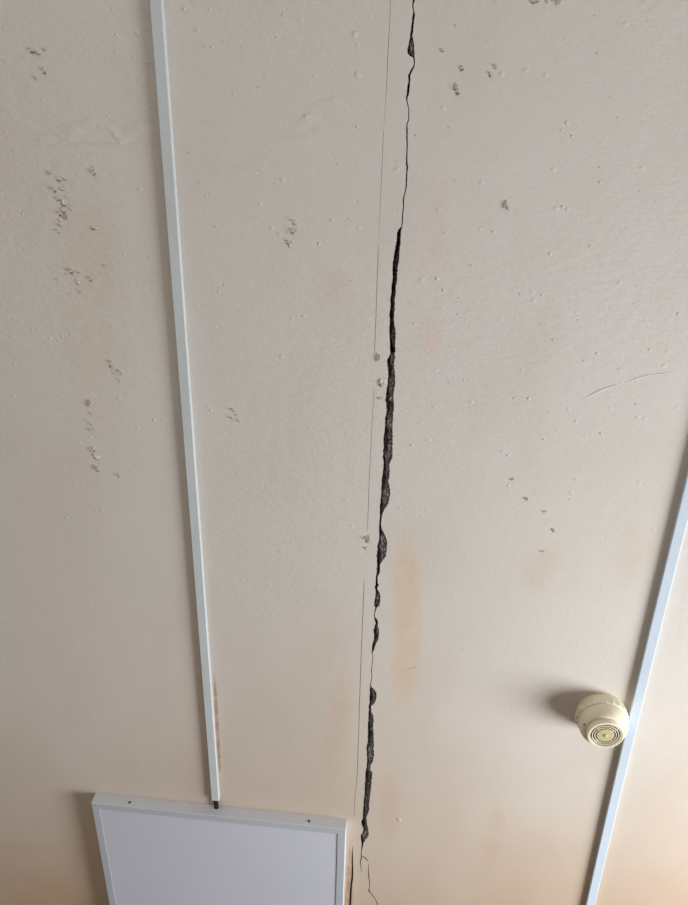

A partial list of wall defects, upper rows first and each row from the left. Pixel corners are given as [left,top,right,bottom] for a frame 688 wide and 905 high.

crack [349,0,415,905]